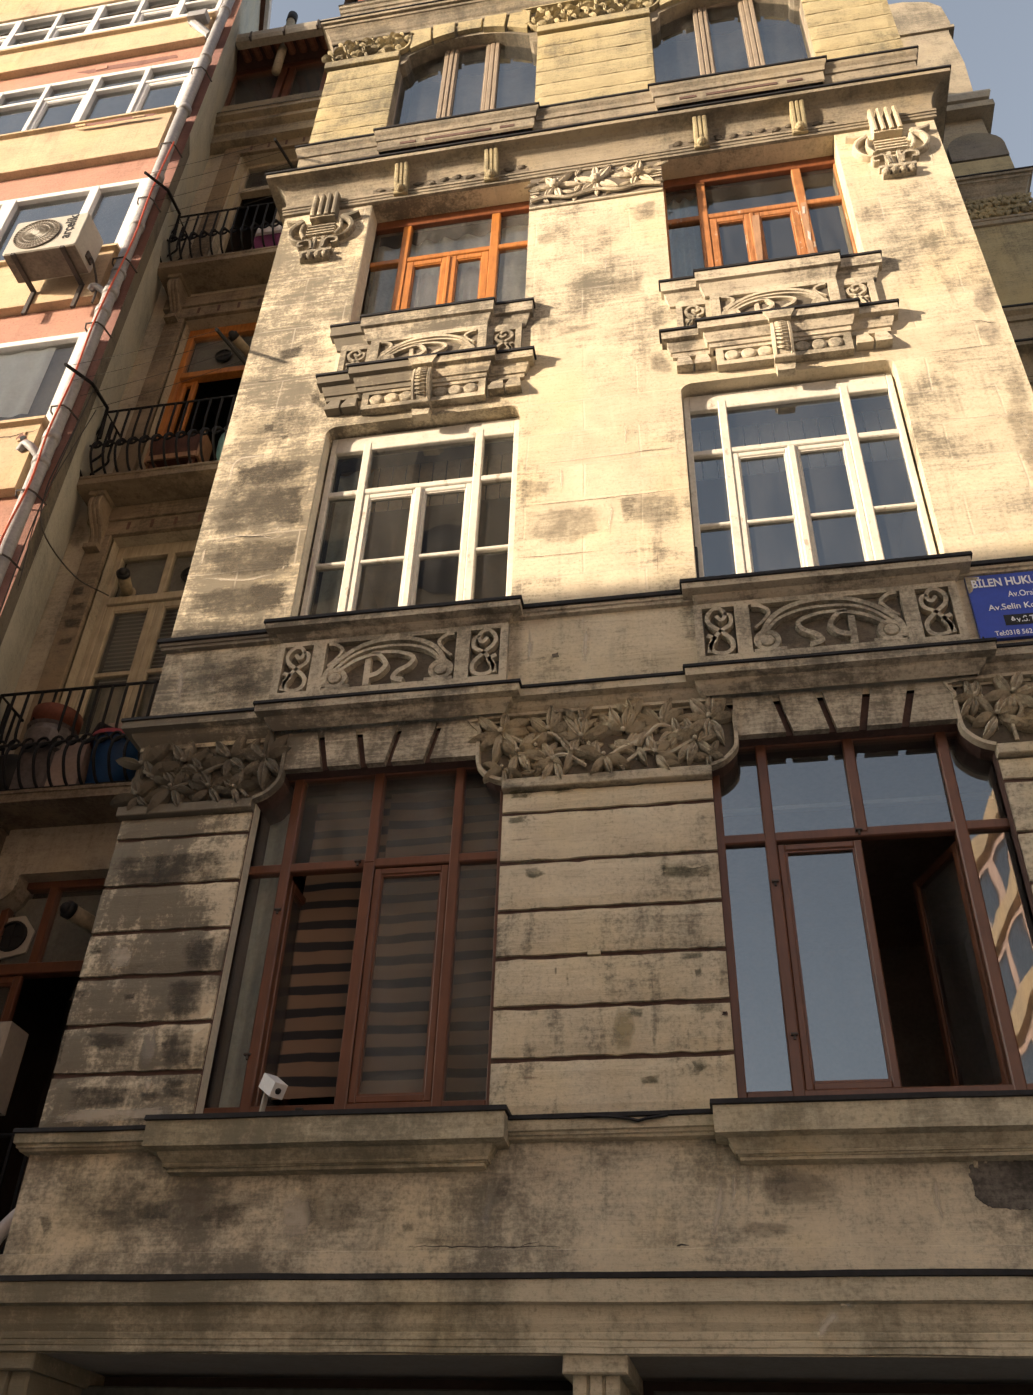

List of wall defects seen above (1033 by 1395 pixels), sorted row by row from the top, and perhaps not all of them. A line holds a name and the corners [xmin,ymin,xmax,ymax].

spalling [968,1160,1033,1210]